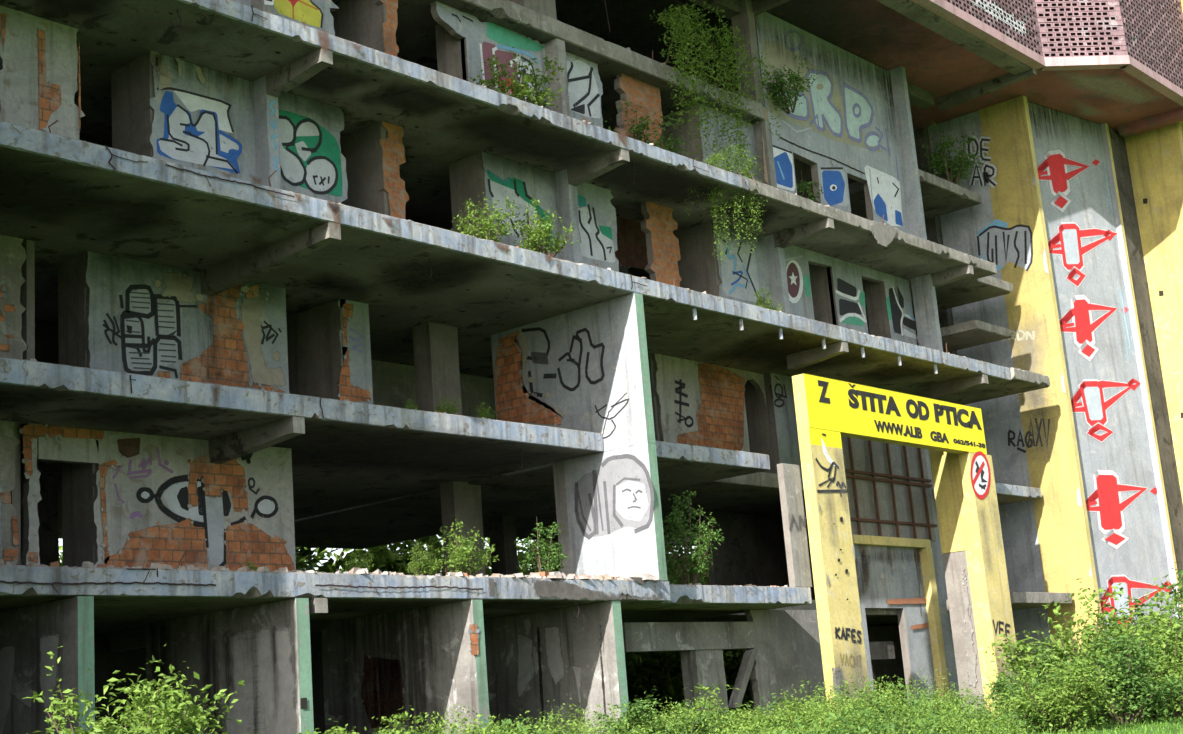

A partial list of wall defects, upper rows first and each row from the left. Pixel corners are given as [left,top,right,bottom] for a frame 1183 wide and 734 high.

flaking render [36,27,61,131]
flaking render [0,492,38,563]
flaking render [19,405,295,571]
flaking render [154,273,290,393]
peeling [337,303,372,402]
spalling [270,426,564,473]
flaking render [494,329,565,427]
flaking render [676,363,745,451]
spalling [328,601,432,612]
peeling [467,623,480,655]
spalling [483,576,663,609]